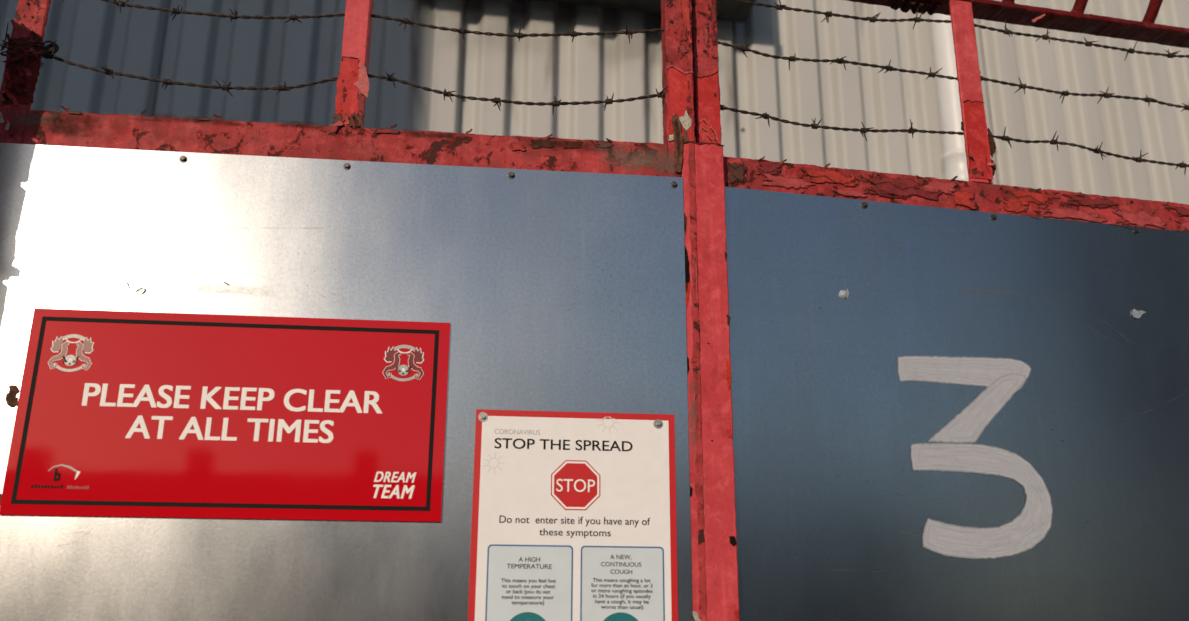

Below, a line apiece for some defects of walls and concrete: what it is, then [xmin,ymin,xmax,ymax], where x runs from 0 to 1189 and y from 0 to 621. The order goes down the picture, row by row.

peeling [0,2,44,130]
peeling [667,0,721,144]
peeling [511,134,613,151]
peeling [727,100,1189,232]